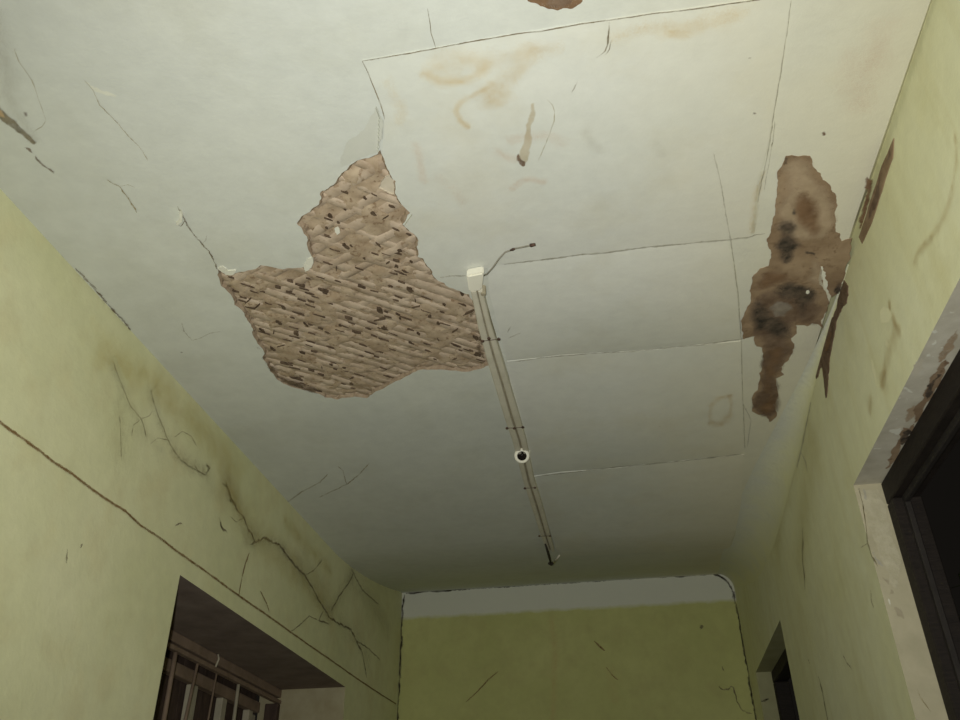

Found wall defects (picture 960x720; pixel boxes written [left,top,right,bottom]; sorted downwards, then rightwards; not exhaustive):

peeling [528,0,583,11]
spalling [0,108,54,174]
leakage [495,103,603,191]
crack [178,208,217,269]
spalling [218,151,488,399]
peeling [741,138,894,422]
crack [114,365,210,475]
spalling [874,329,958,469]
crack [0,421,572,720]